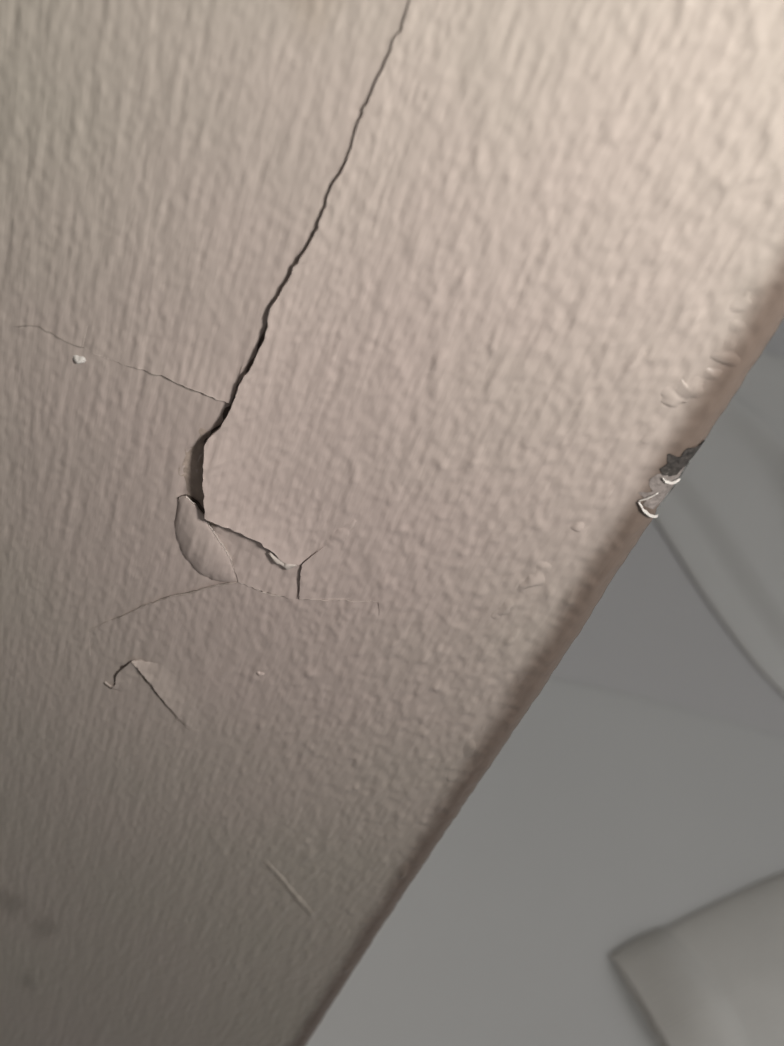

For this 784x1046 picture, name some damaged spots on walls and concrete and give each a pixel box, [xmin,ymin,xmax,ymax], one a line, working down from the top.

peeling [175,0,471,600]
peeling [638,440,705,518]